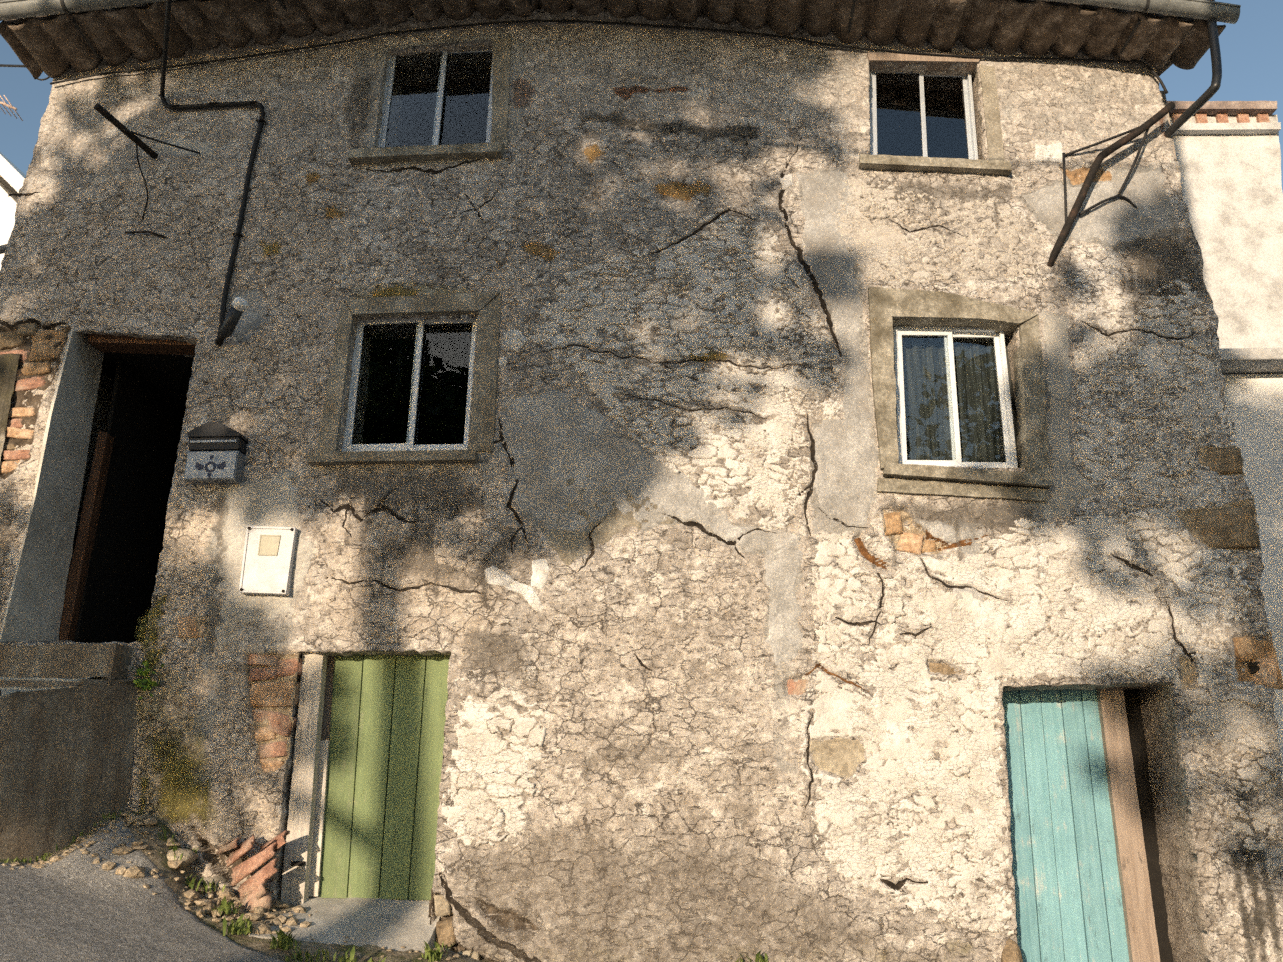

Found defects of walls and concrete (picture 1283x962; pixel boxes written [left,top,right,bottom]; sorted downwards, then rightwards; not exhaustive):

crack [651,137,842,357]
flaking render [0,323,71,480]
crack [544,344,807,419]
peeling [526,204,844,532]
crack [319,488,424,539]
crack [325,577,493,596]
crack [920,535,1009,601]
peeling [787,277,1283,936]
flaking render [243,651,302,777]
peeling [441,687,547,847]